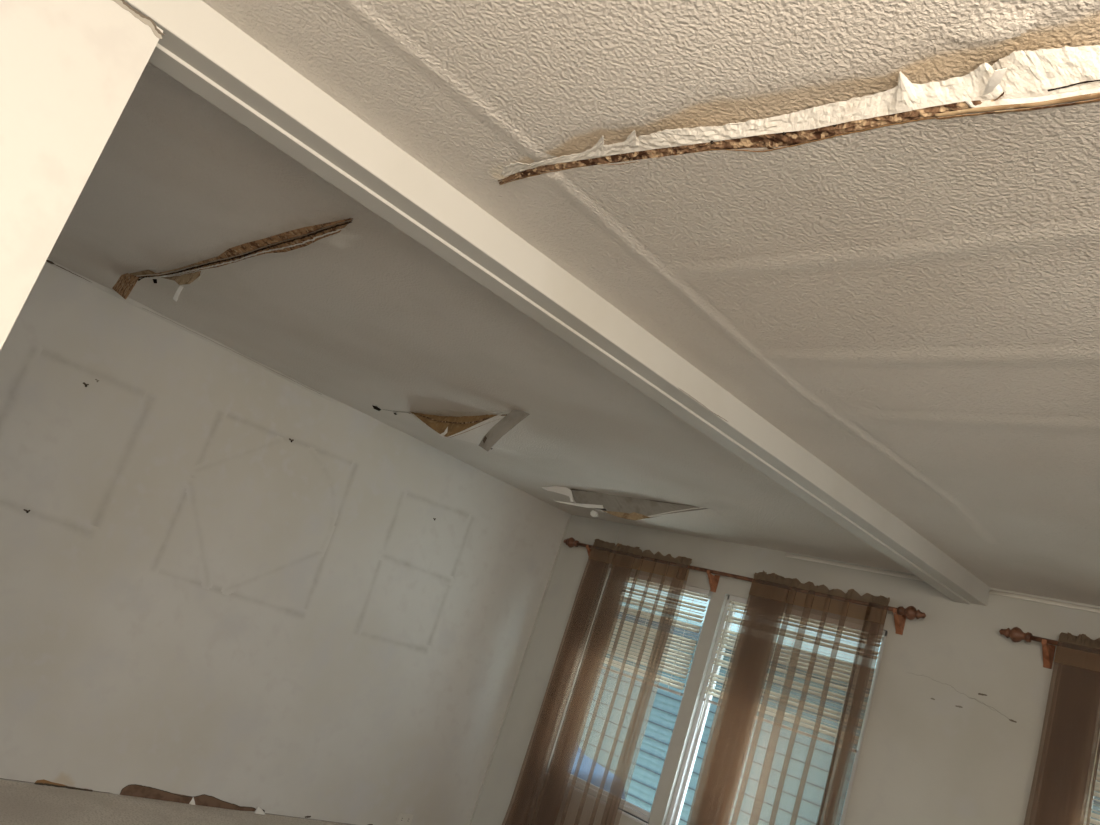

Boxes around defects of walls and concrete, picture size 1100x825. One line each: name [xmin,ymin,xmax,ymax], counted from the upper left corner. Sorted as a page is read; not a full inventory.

crack [113,0,165,39]
peeling [542,486,604,509]
spalling [34,770,93,792]